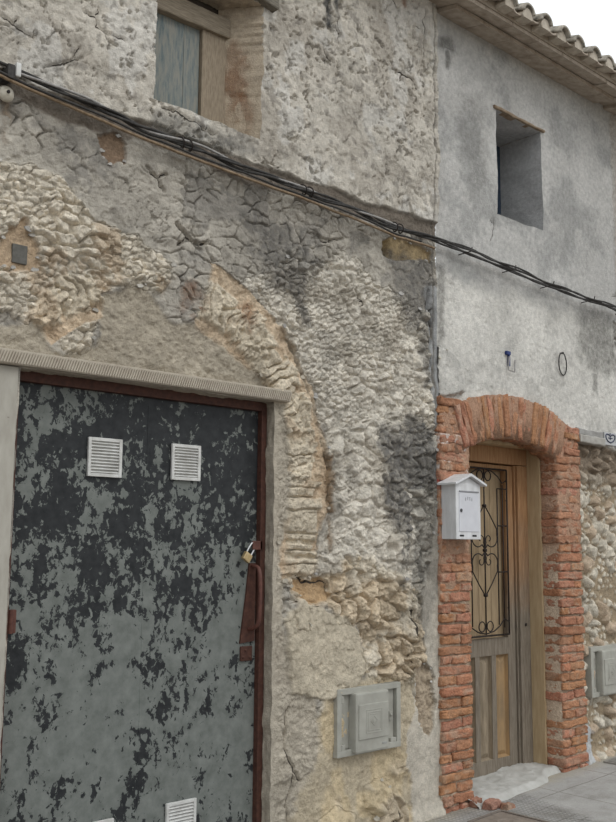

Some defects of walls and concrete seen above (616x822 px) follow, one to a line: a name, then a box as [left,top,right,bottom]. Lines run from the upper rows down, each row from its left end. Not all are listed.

damp [324,0,338,28]
spalling [97,133,127,166]
spalling [0,157,177,355]
spalling [381,237,430,263]
spalling [576,442,616,762]